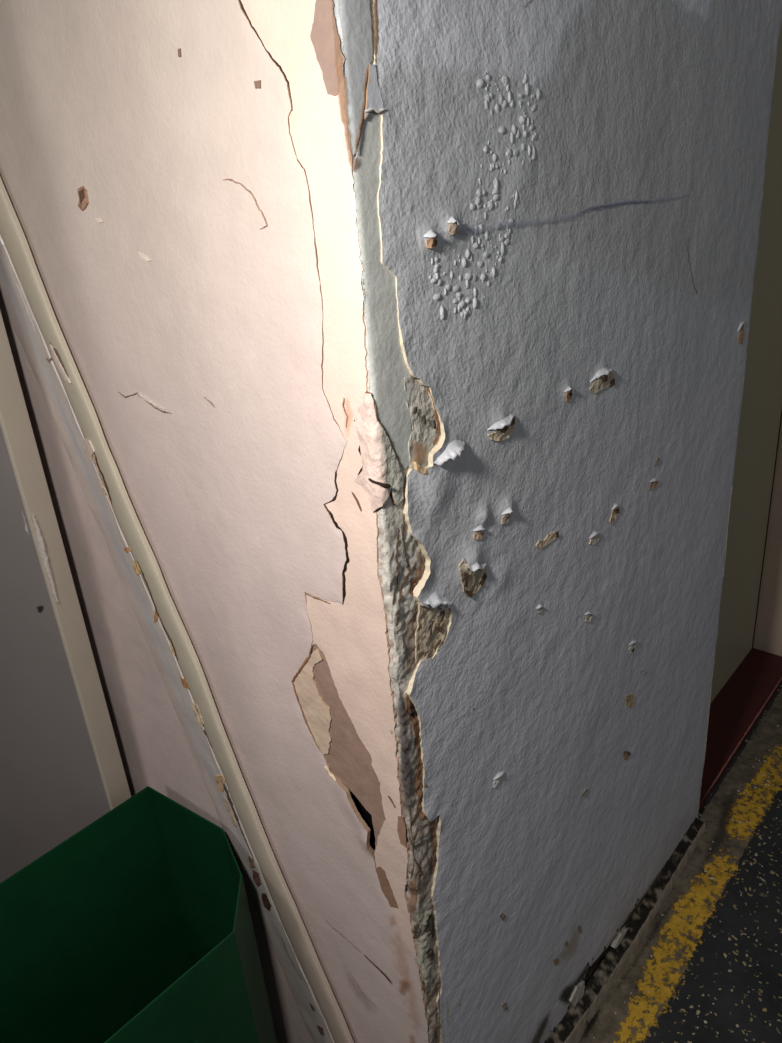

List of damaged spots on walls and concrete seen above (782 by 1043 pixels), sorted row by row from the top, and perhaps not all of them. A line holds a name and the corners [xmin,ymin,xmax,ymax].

peeling [77,186,89,211]
crack [224,179,268,229]
crack [239,0,363,604]
peeling [589,367,615,393]
crack [118,391,169,413]
peeling [487,414,515,441]
flaking render [292,0,465,1043]
peeling [473,525,486,540]
peeling [450,558,487,598]
crack [324,919,392,1007]